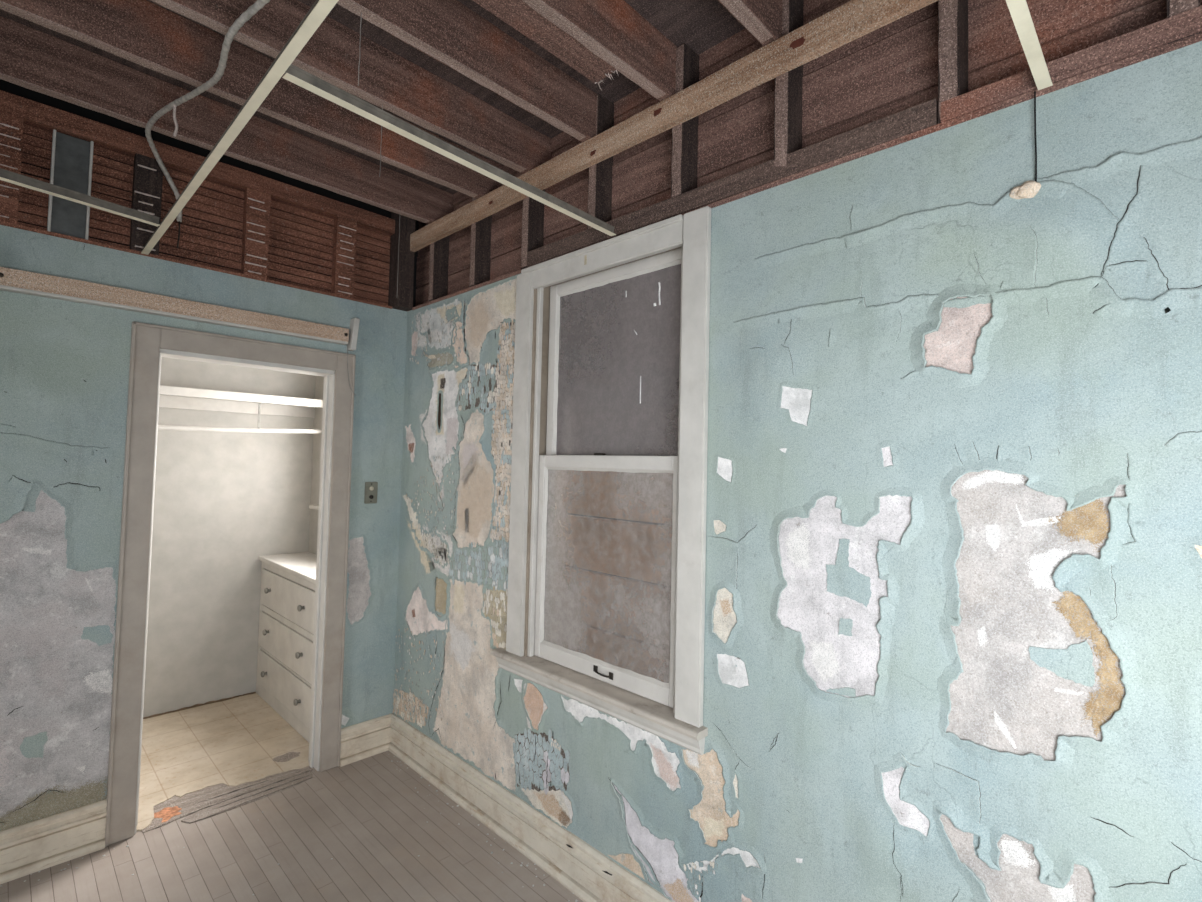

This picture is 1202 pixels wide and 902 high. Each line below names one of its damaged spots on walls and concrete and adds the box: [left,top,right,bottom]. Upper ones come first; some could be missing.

peeling [731,276,1202,388]
crack [9,450,106,512]
peeling [876,440,900,472]
peeling [0,478,119,822]
peeling [346,534,375,627]
peeling [393,273,767,902]
peeling [769,487,925,705]
peeling [938,457,1146,773]
peeling [873,753,1115,902]